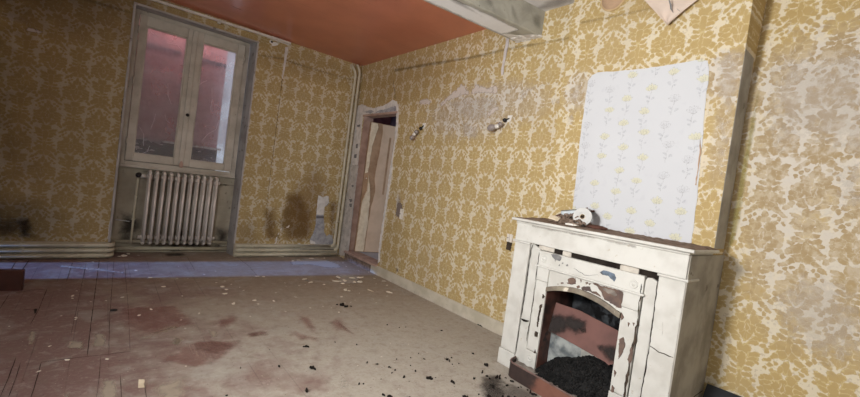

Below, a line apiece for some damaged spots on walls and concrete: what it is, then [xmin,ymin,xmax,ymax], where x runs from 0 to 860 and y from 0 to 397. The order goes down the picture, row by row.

flaking render [298,100,399,263]